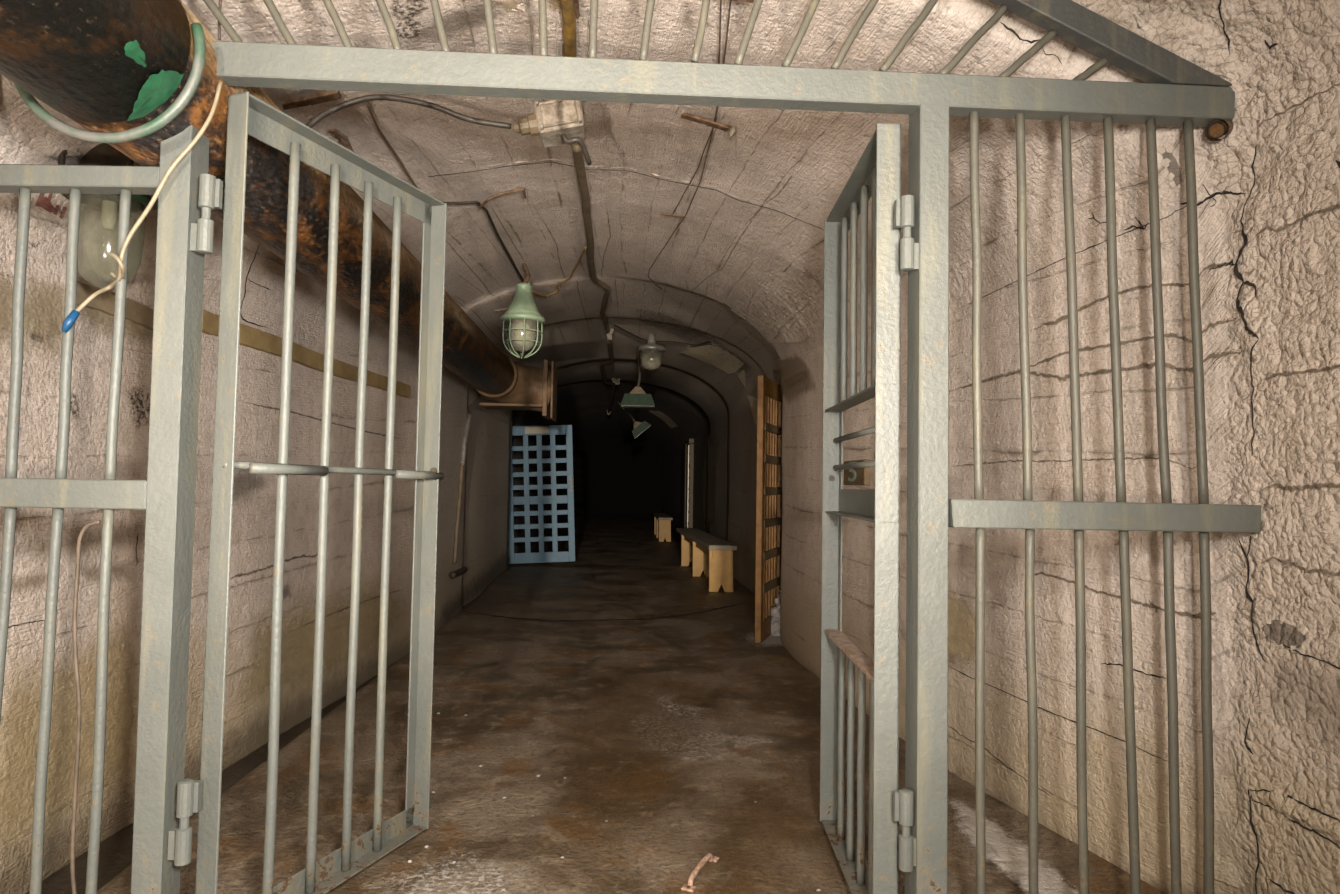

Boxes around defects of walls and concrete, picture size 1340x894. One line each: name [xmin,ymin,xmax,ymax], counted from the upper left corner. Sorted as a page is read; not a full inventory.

crack [429,162,824,343]
spalling [1259,619,1306,650]
crack [1244,718,1253,754]
crack [1248,790,1295,894]